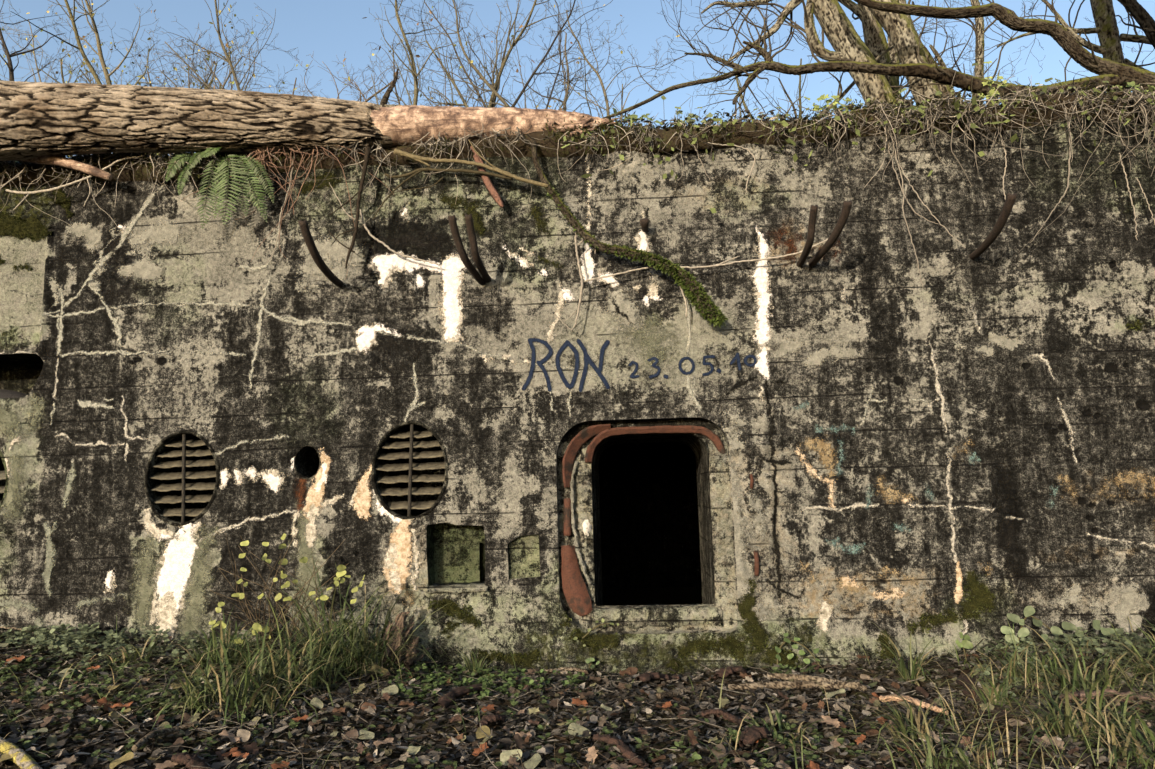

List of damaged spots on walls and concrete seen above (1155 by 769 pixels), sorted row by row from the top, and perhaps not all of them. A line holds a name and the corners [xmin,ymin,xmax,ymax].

crack [0,182,608,460]
leakage [350,204,510,373]
leakage [503,246,573,344]
leakage [581,153,619,288]
leakage [748,225,775,401]
corrosion [774,226,801,262]
leakage [138,507,205,643]
crack [197,509,299,543]
leakage [291,447,422,605]
crack [727,371,879,598]
crack [861,340,1022,640]
crack [1029,352,1077,463]